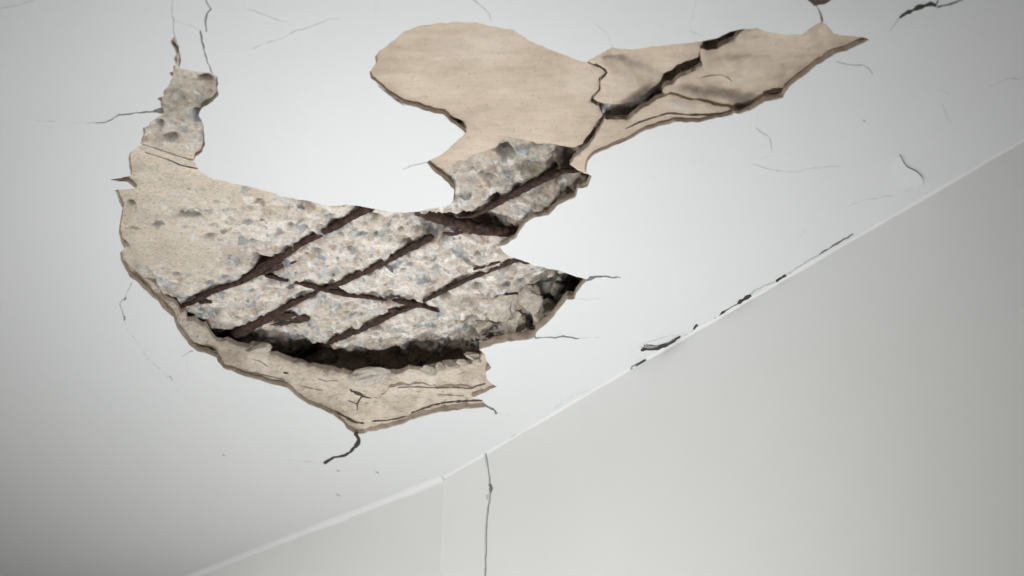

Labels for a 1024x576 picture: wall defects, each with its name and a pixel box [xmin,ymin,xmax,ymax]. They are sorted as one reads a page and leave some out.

crack [890,0,962,31]
crack [35,108,162,124]
rust [179,167,581,359]
spalling [111,22,869,434]
crack [684,234,853,336]
crack [238,359,517,465]
crack [484,453,492,576]